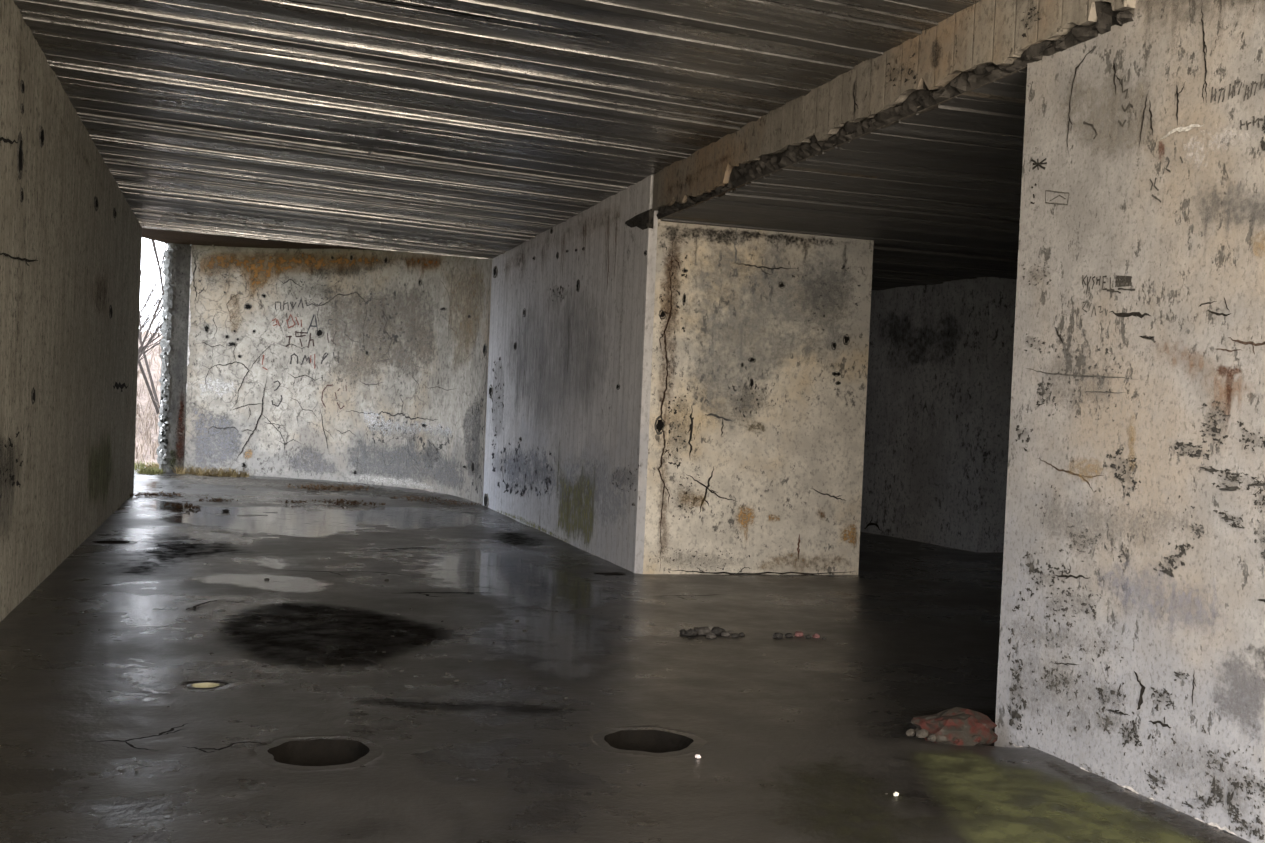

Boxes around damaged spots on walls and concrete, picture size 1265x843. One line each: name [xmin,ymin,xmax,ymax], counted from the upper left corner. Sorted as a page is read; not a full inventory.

spalling [625,1,1133,336]
corrosion [202,253,391,287]
corrosion [407,257,440,269]
damp [289,448,337,474]
crack [192,251,491,482]
damp [348,406,480,490]
crack [658,239,854,599]
corrosion [1218,367,1240,411]
peeling [1007,449,1265,840]